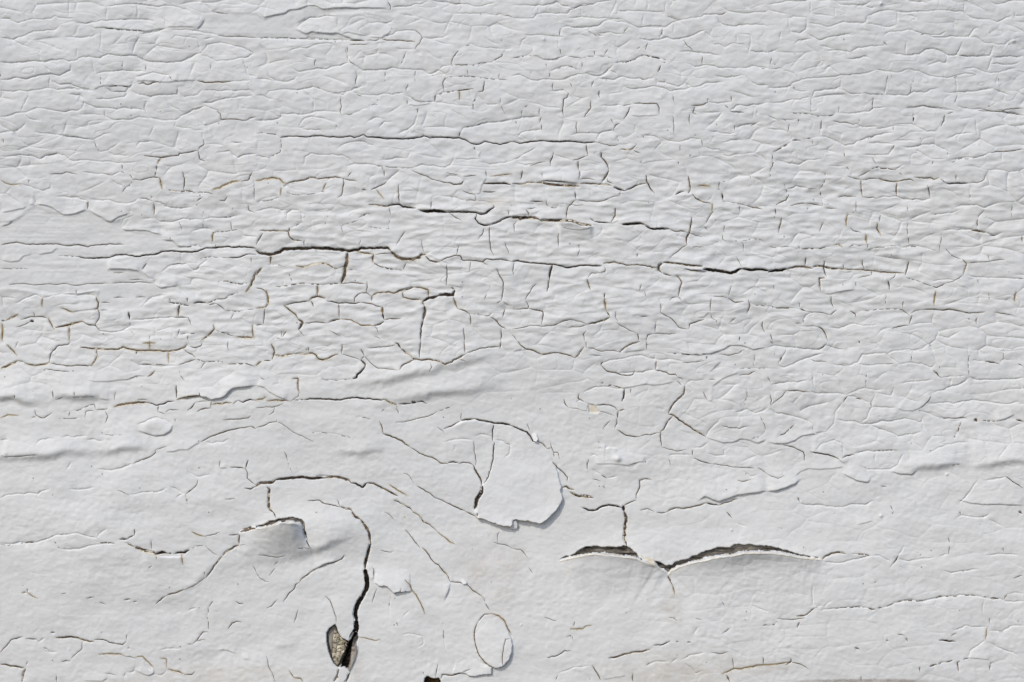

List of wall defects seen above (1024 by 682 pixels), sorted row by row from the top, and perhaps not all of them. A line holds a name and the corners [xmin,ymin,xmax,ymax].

crack [100,68,230,92]
crack [216,12,422,115]
crack [406,45,524,124]
crack [1,76,1023,603]
crack [1,632,192,681]
crack [270,556,344,620]
peeling [332,631,348,682]
crack [308,500,425,682]
crack [408,533,511,667]
crack [592,617,701,680]
crack [712,631,807,682]
crack [772,575,1021,671]